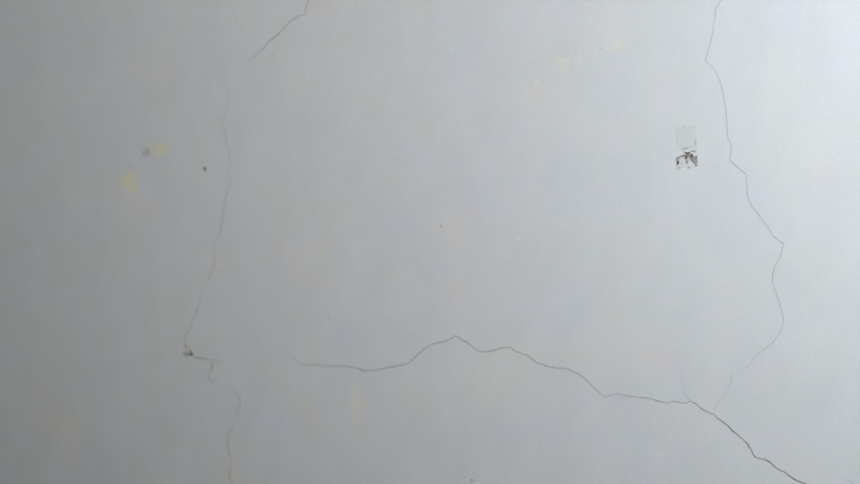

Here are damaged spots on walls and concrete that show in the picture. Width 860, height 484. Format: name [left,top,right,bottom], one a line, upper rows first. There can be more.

crack [282,0,808,484]